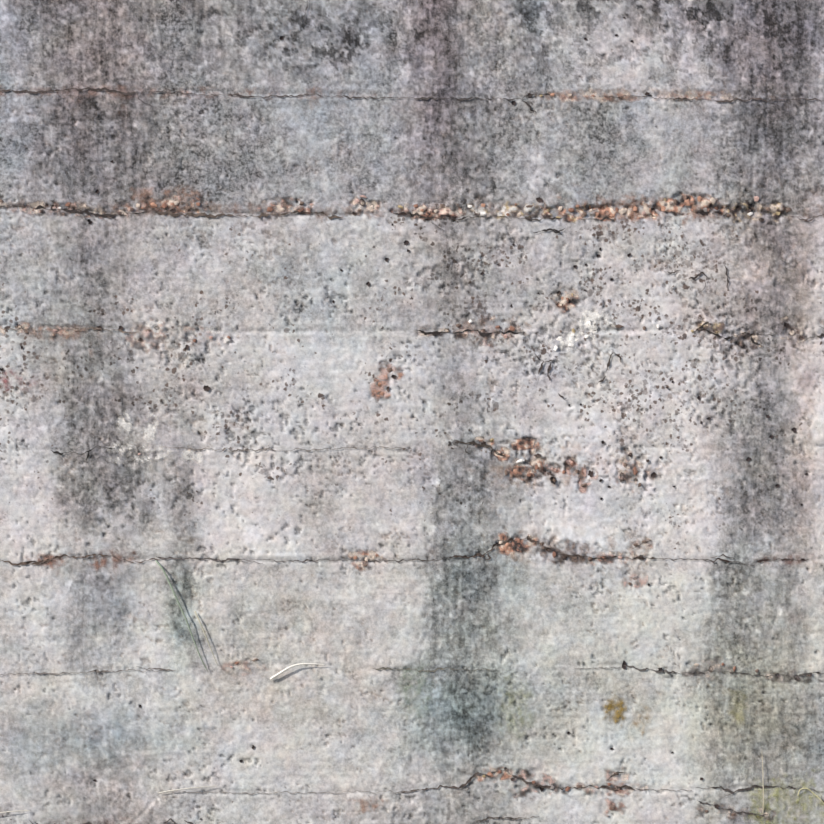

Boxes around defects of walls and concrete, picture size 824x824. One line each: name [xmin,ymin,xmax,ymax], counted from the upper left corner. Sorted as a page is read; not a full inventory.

leakage [179,0,395,82]
crack [0,87,552,118]
leakage [389,0,497,306]
spalling [390,193,792,224]
leakage [9,0,167,529]
spalling [476,437,657,493]
crack [1,537,809,566]
spalling [496,533,652,564]
leakage [415,439,504,815]
crack [577,664,824,681]
crack [174,770,824,816]
spalling [477,767,629,817]